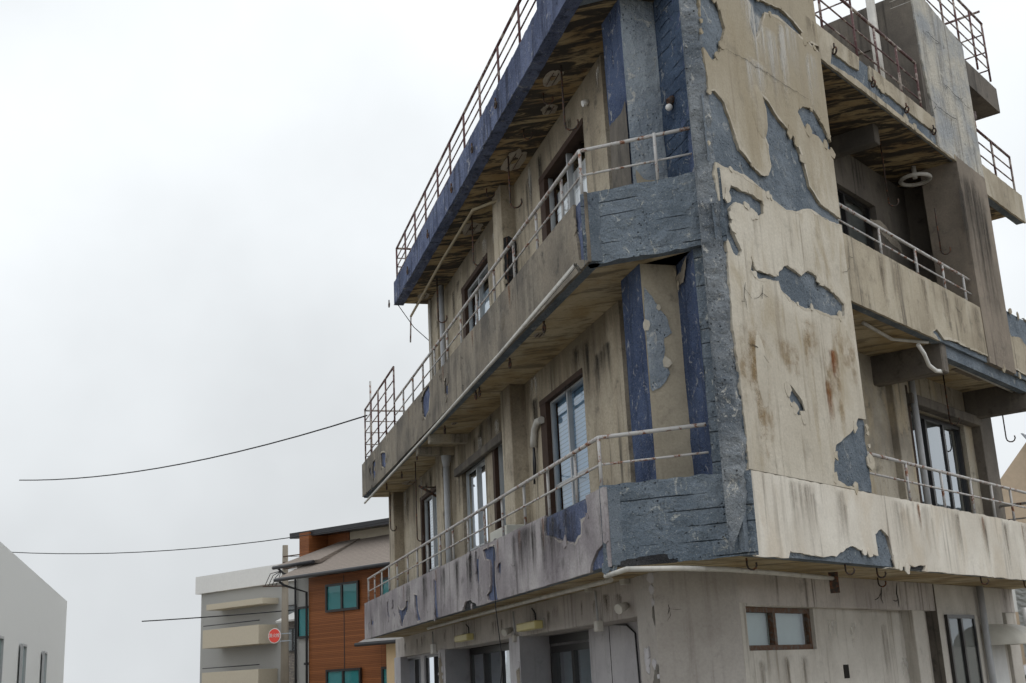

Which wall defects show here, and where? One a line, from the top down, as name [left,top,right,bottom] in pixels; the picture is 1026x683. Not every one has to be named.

peeling [699,0,725,60]
peeling [748,0,816,51]
spalling [831,54,936,145]
peeling [701,89,839,255]
peeling [751,255,842,321]
peeling [643,287,672,391]
peeling [420,373,449,420]
peeling [833,420,875,495]
peeling [467,543,501,601]
peeling [546,499,589,549]
spalling [789,530,923,574]
peeling [391,595,420,626]